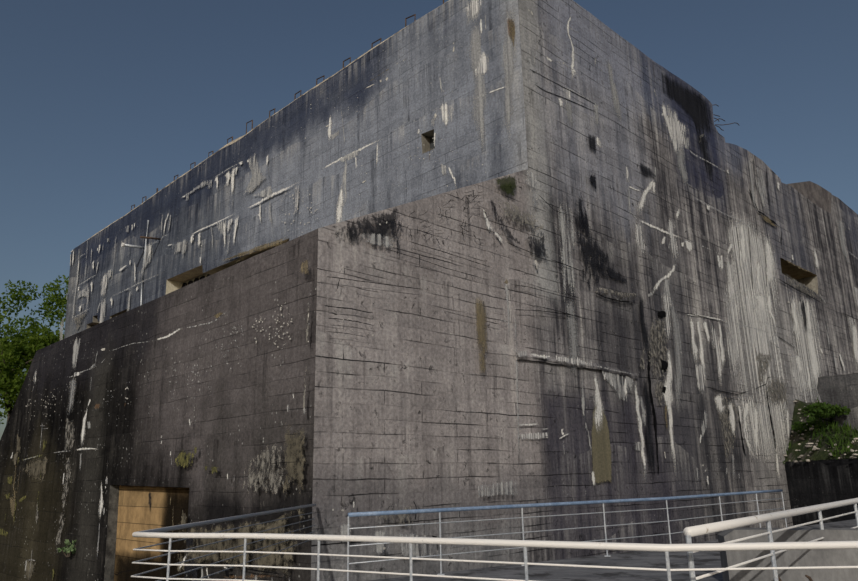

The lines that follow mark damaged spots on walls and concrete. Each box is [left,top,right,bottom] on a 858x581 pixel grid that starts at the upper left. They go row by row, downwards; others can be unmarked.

leakage [654,73,713,181]
leakage [168,215,238,253]
leakage [183,161,243,202]
leakage [326,143,402,254]
leakage [558,197,627,290]
rust [475,299,487,372]
leakage [663,159,845,474]
leakage [518,303,646,484]
leakage [55,380,90,553]
peeling [243,425,305,494]
leakage [114,488,189,581]
peeling [178,509,304,581]